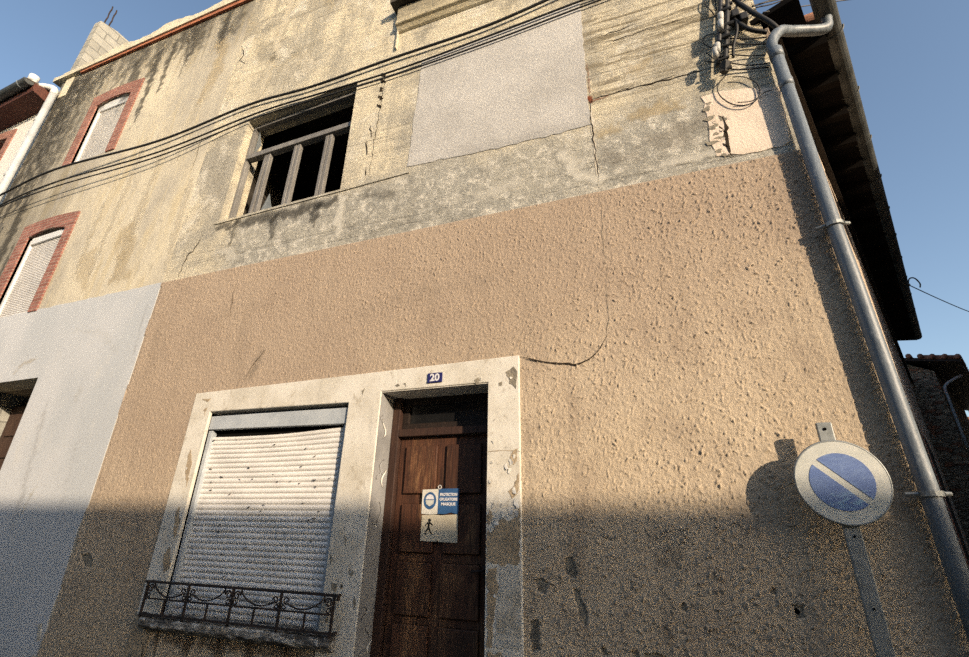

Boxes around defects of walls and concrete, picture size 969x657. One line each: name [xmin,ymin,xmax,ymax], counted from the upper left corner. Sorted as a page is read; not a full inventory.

damp [115,20,207,122]
crack [365,69,387,175]
peeling [701,87,790,157]
crack [519,66,715,366]
peeling [486,448,521,657]
spalling [529,620,541,651]
spalling [565,557,577,578]
spalling [574,590,588,625]